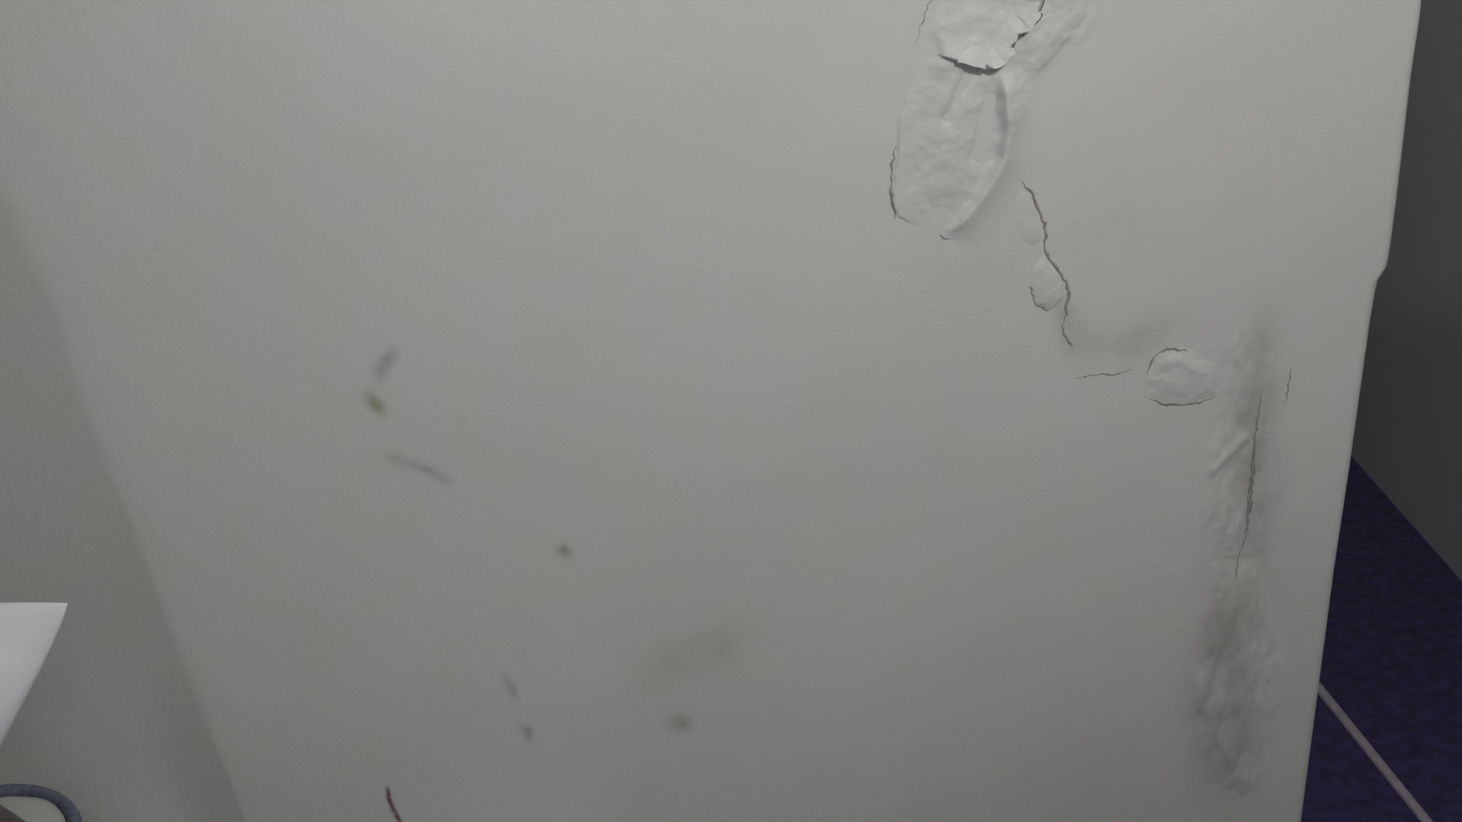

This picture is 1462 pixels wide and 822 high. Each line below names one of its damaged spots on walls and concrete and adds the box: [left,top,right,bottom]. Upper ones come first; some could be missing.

peeling [889,0,1104,249]
crack [1014,181,1131,378]